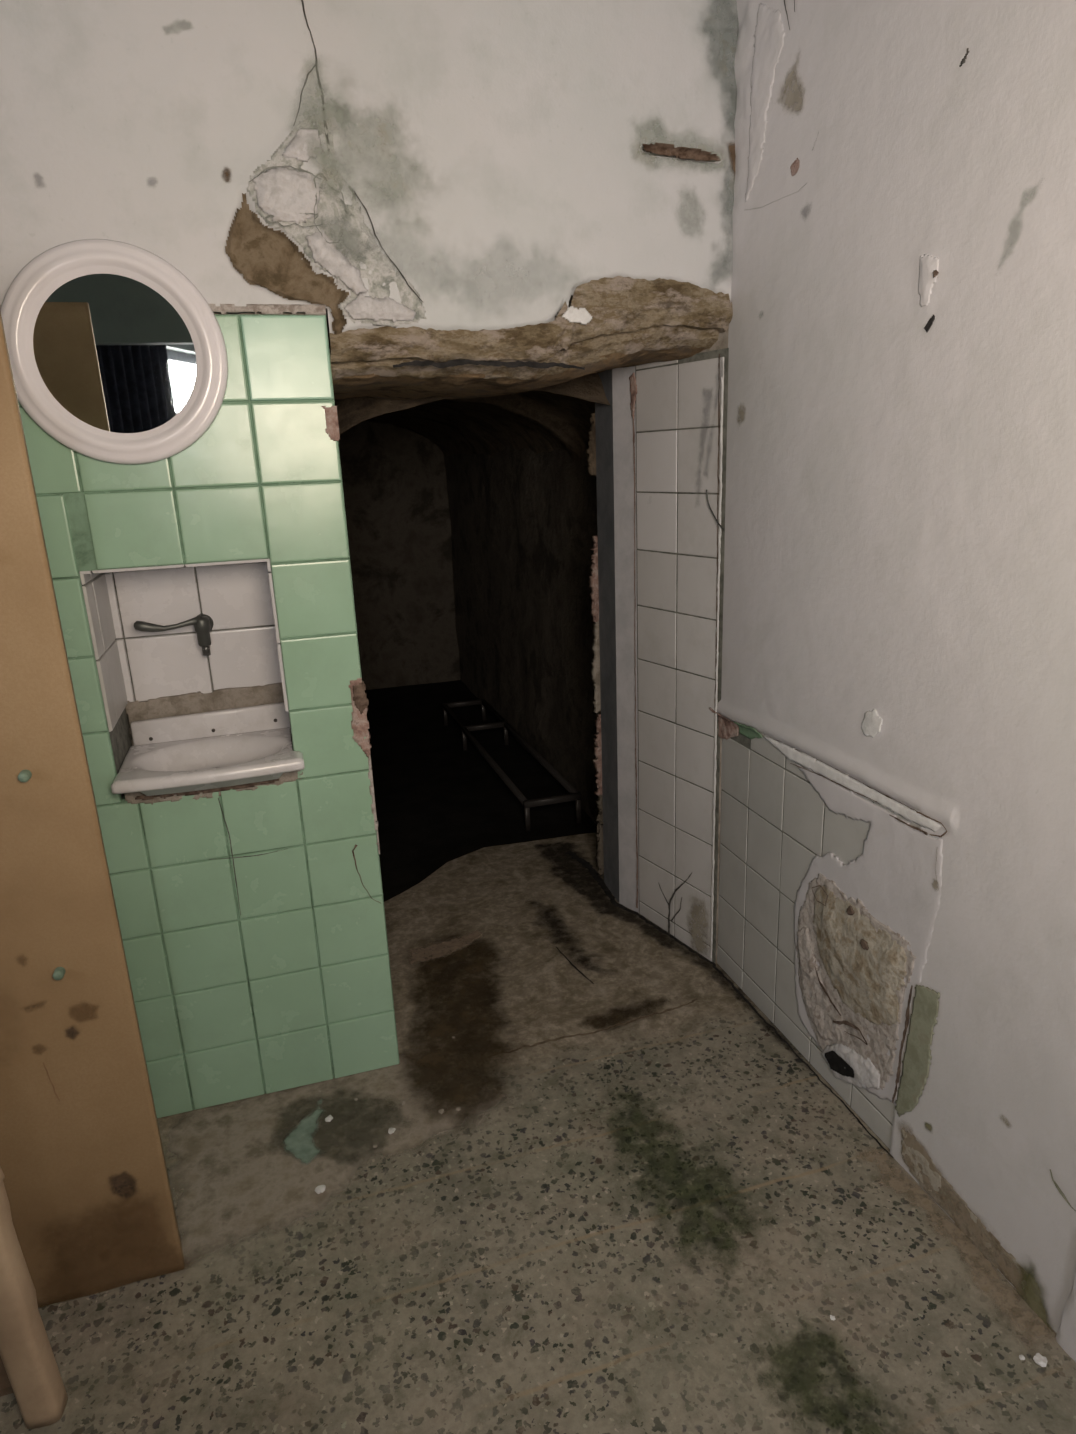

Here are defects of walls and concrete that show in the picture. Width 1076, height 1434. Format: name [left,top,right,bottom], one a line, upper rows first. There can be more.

crack [293,0,344,153]
damp [704,0,739,133]
crack [354,191,423,302]
flaking render [225,114,733,380]
rust [643,142,736,173]
damp [690,141,735,222]
flaking render [764,736,943,1103]
damp [407,936,510,1117]